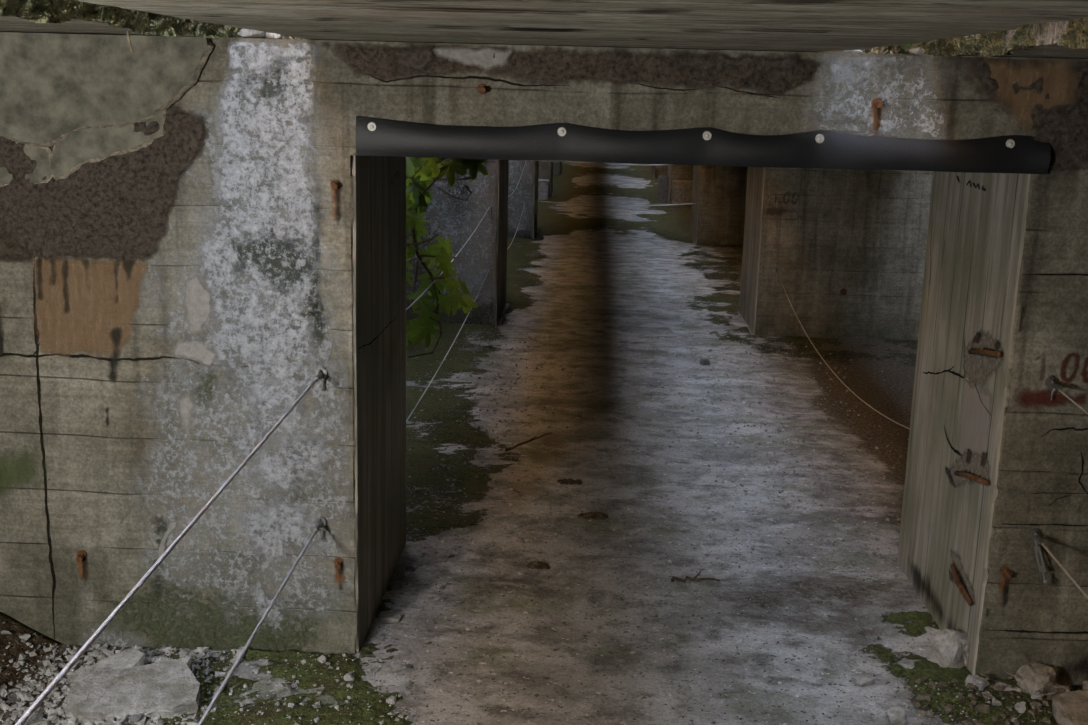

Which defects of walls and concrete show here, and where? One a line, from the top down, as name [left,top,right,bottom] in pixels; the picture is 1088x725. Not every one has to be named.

flaking render [0,32,214,262]
rust [332,187,340,221]
rust [873,100,881,131]
leakage [34,257,161,381]
leakage [87,41,350,652]
crack [0,256,248,639]
crack [1006,427,1088,526]
rust [335,561,343,589]